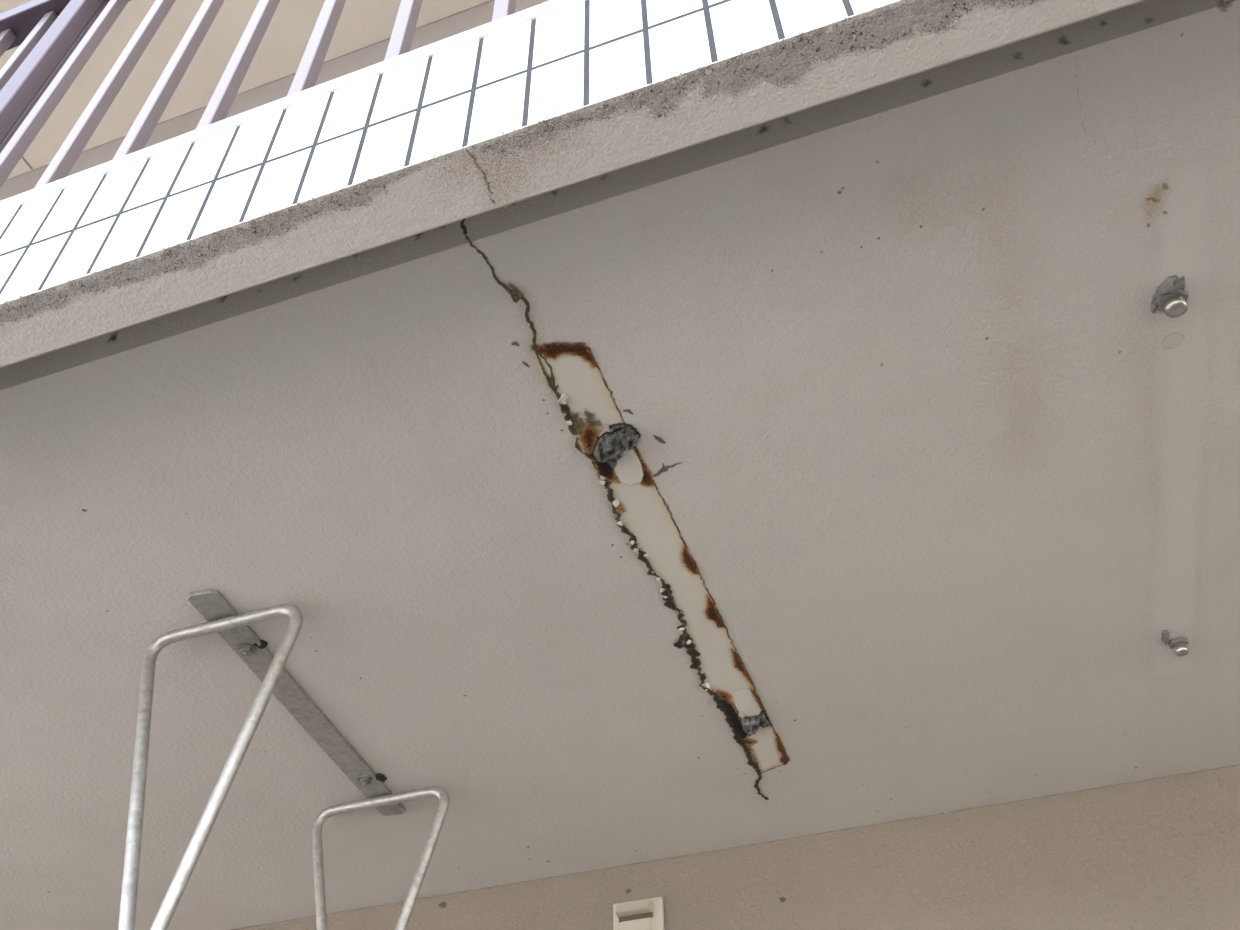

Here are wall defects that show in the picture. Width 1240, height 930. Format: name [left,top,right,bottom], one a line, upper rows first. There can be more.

corrosion [536,340,624,423]
crack [414,101,769,800]
peeling [523,344,788,772]
corrosion [575,418,790,765]